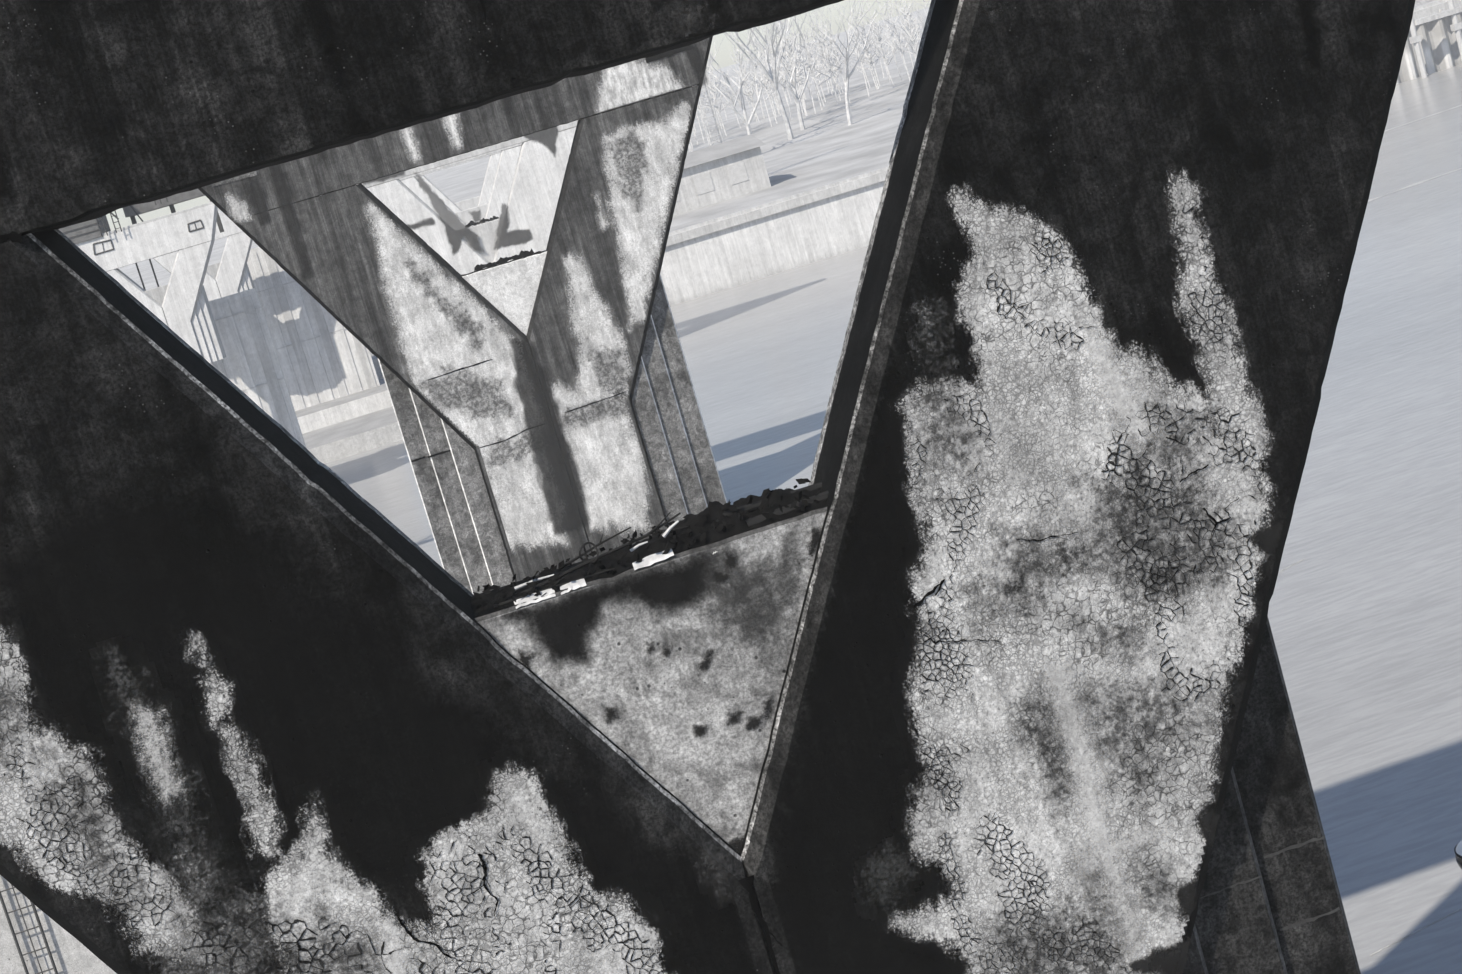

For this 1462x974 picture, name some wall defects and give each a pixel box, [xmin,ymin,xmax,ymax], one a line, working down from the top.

damp [1117,272,1199,388]
crack [1017,532,1077,541]
crack [1180,464,1239,557]
crack [914,579,997,643]
damp [0,493,757,974]
crack [394,912,463,962]
crack [472,853,499,916]
crack [738,875,783,974]